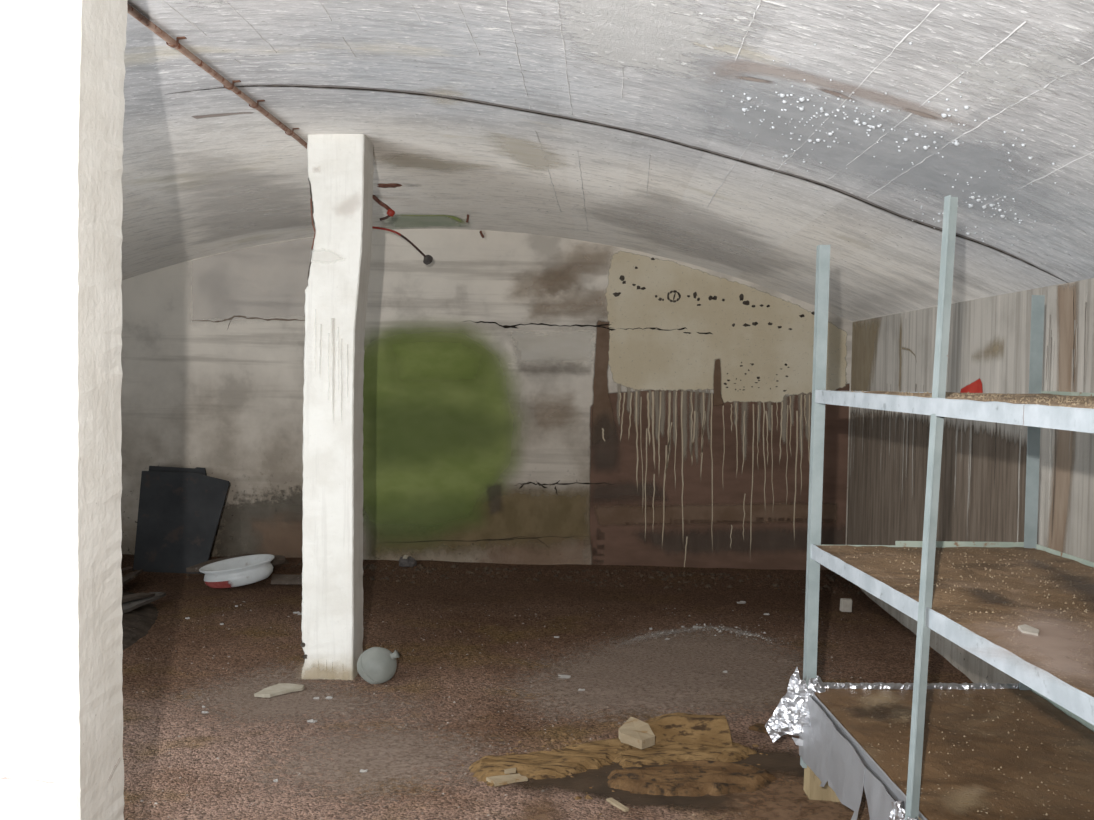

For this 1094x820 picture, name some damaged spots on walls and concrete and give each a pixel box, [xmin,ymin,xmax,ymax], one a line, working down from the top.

crack [193,316,305,327]
crack [464,321,712,334]
damp [831,319,879,391]
damp [371,321,812,570]
damp [821,404,930,545]
damp [936,420,1027,542]